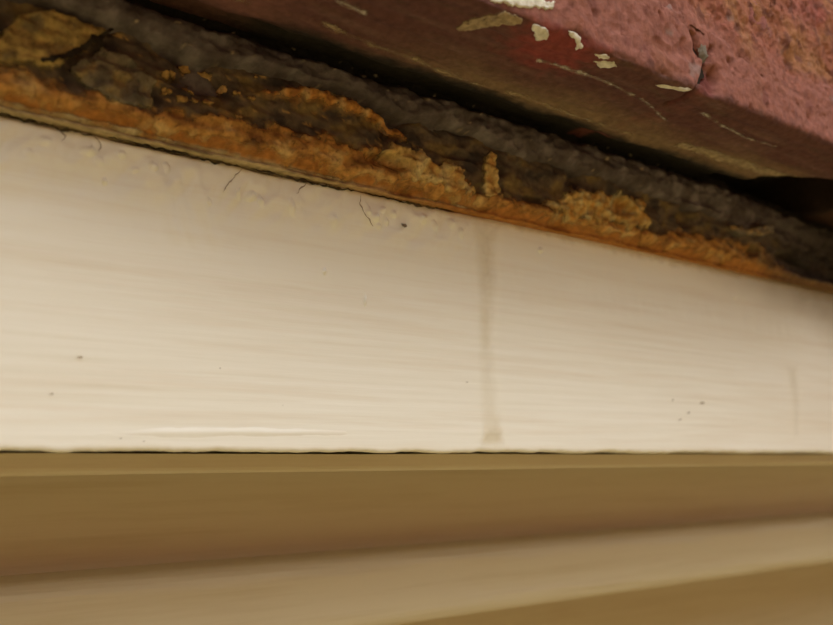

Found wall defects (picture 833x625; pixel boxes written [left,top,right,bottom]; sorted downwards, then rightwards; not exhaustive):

peeling [456,0,555,31]
peeling [531,24,549,41]
peeling [568,31,583,50]
peeling [594,54,617,68]
spalling [659,0,833,92]
corrosion [0,9,774,263]
damp [677,143,792,176]